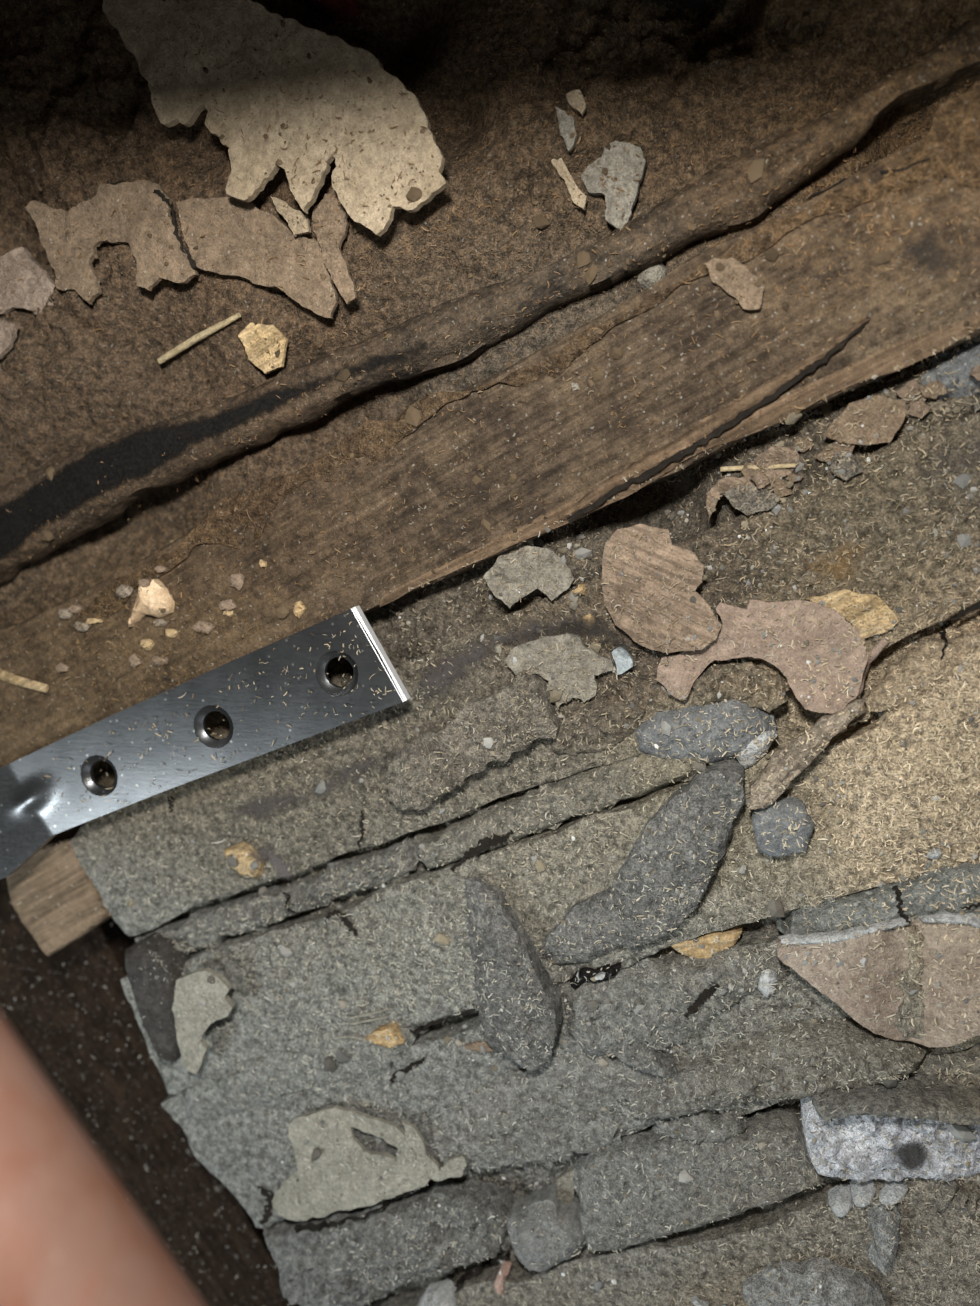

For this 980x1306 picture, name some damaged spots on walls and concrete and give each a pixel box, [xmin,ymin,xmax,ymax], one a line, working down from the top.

peeling [484,544,575,608]
peeling [806,589,899,638]
crack [939,600,980,660]
peeling [504,632,634,710]
crack [450,829,513,872]
crack [892,885,911,923]
peeling [172,968,235,1074]
crack [389,1009,476,1083]
crack [683,984,720,1018]
spalling [758,969,778,998]
peeling [272,1105,468,1221]
crack [257,1186,415,1233]